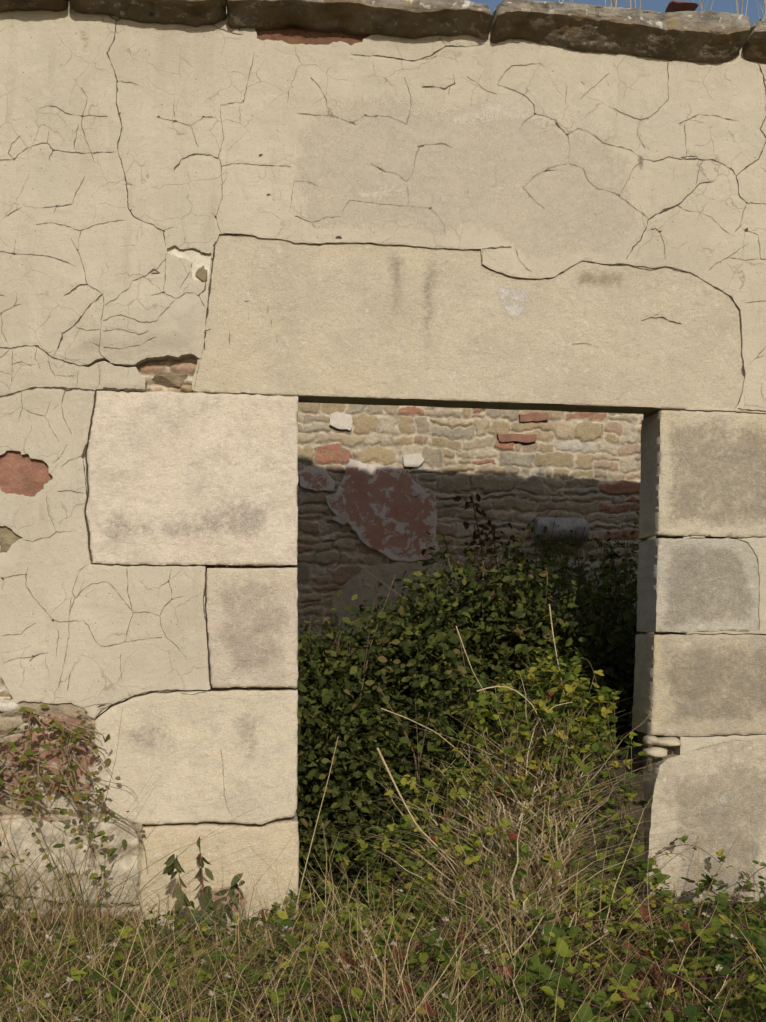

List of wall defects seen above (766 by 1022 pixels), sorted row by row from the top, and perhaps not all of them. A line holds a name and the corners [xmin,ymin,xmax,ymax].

flaking render [167,247,211,282]
flaking render [136,357,197,393]
crack [0,15,766,718]
flaking render [0,451,53,497]
peeling [299,459,440,562]
flaking render [0,526,23,553]
flaking render [0,676,144,959]